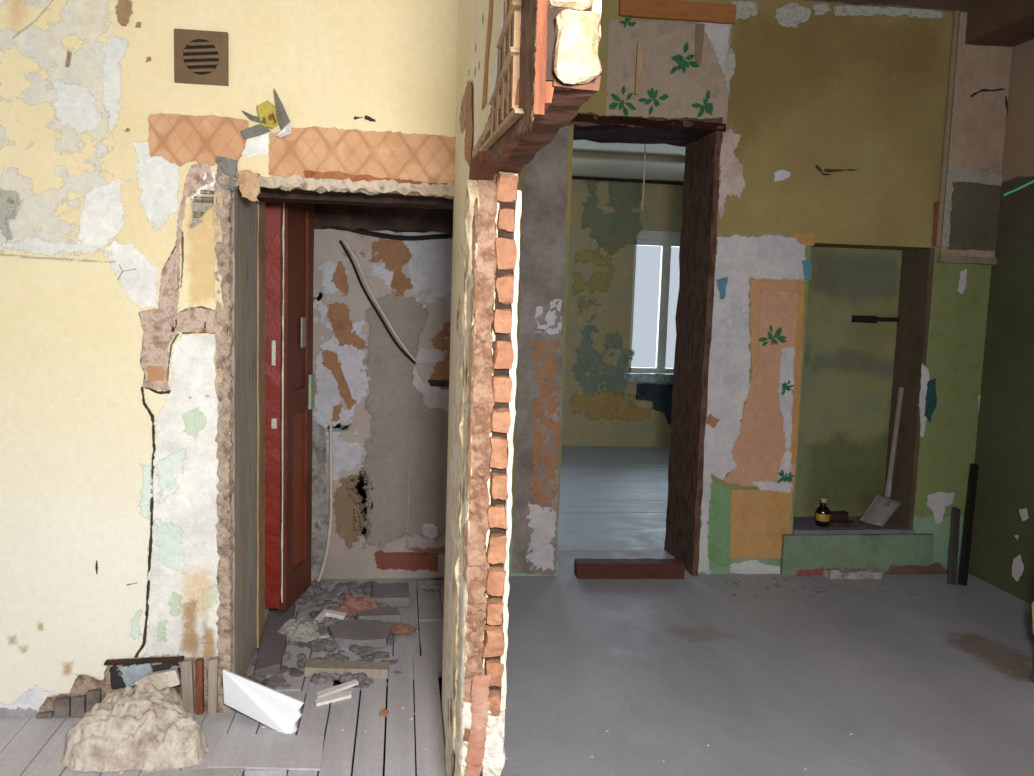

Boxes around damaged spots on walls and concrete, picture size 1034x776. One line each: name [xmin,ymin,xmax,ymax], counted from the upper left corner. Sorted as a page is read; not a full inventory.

flaking render [459,0,538,166]
flaking render [775,2,943,29]
peeling [774,170,791,182]
crack [0,254,136,280]
crack [134,231,216,658]
peeling [0,0,491,776]
flaking render [511,112,746,576]
peeling [698,233,815,574]
peeling [1012,555,1024,581]